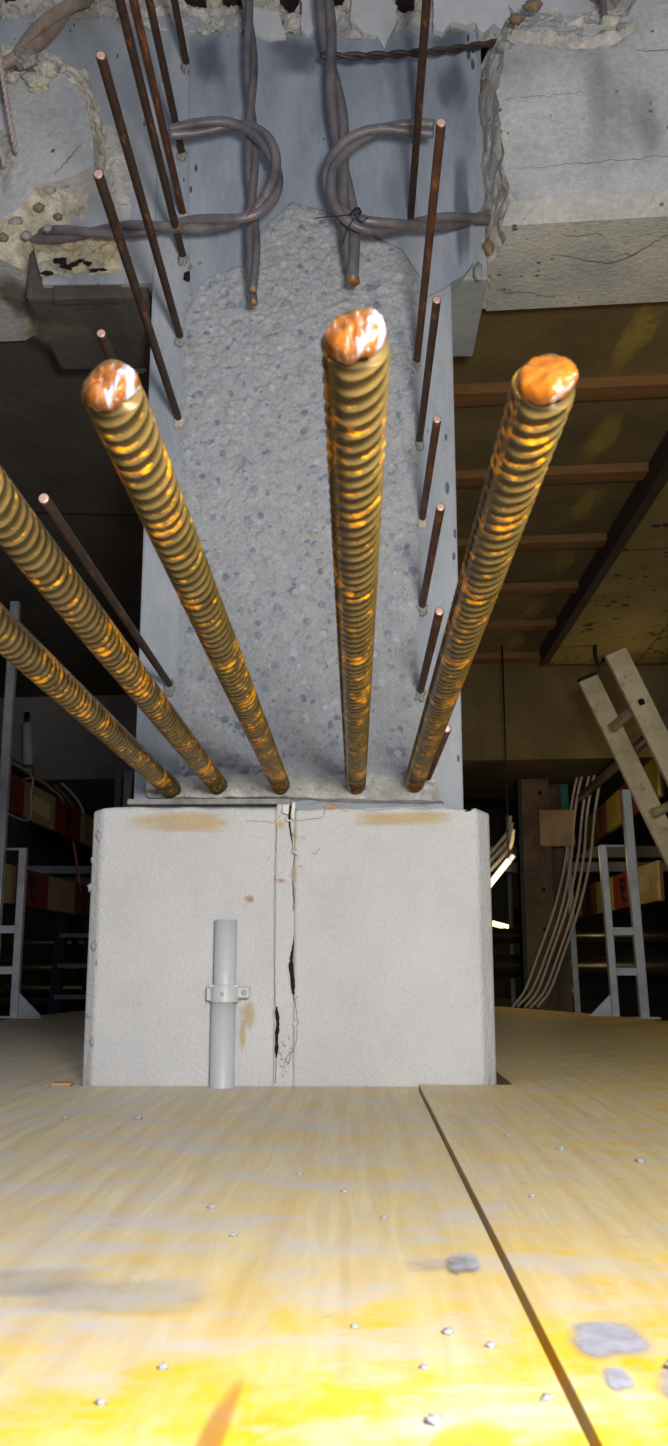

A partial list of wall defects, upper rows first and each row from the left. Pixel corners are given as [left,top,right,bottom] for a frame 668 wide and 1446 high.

crack [552,233,668,264]
spalling [0,0,637,823]
crack [247,802,347,1083]